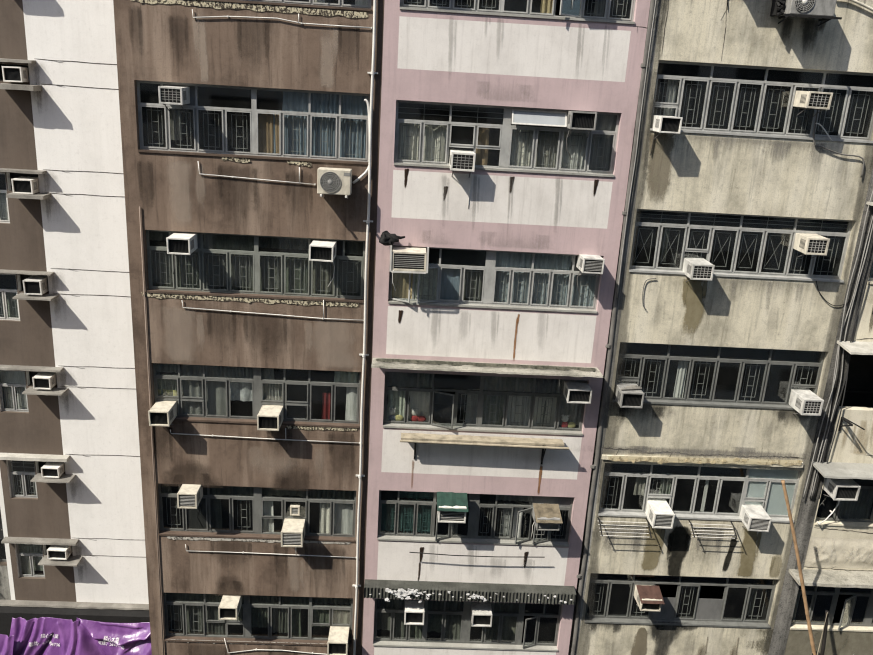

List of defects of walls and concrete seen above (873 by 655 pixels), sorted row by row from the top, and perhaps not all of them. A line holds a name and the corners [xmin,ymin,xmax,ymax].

damp [647,134,674,198]
damp [682,278,708,333]
damp [614,524,718,576]
damp [723,529,762,577]
damp [631,622,698,655]